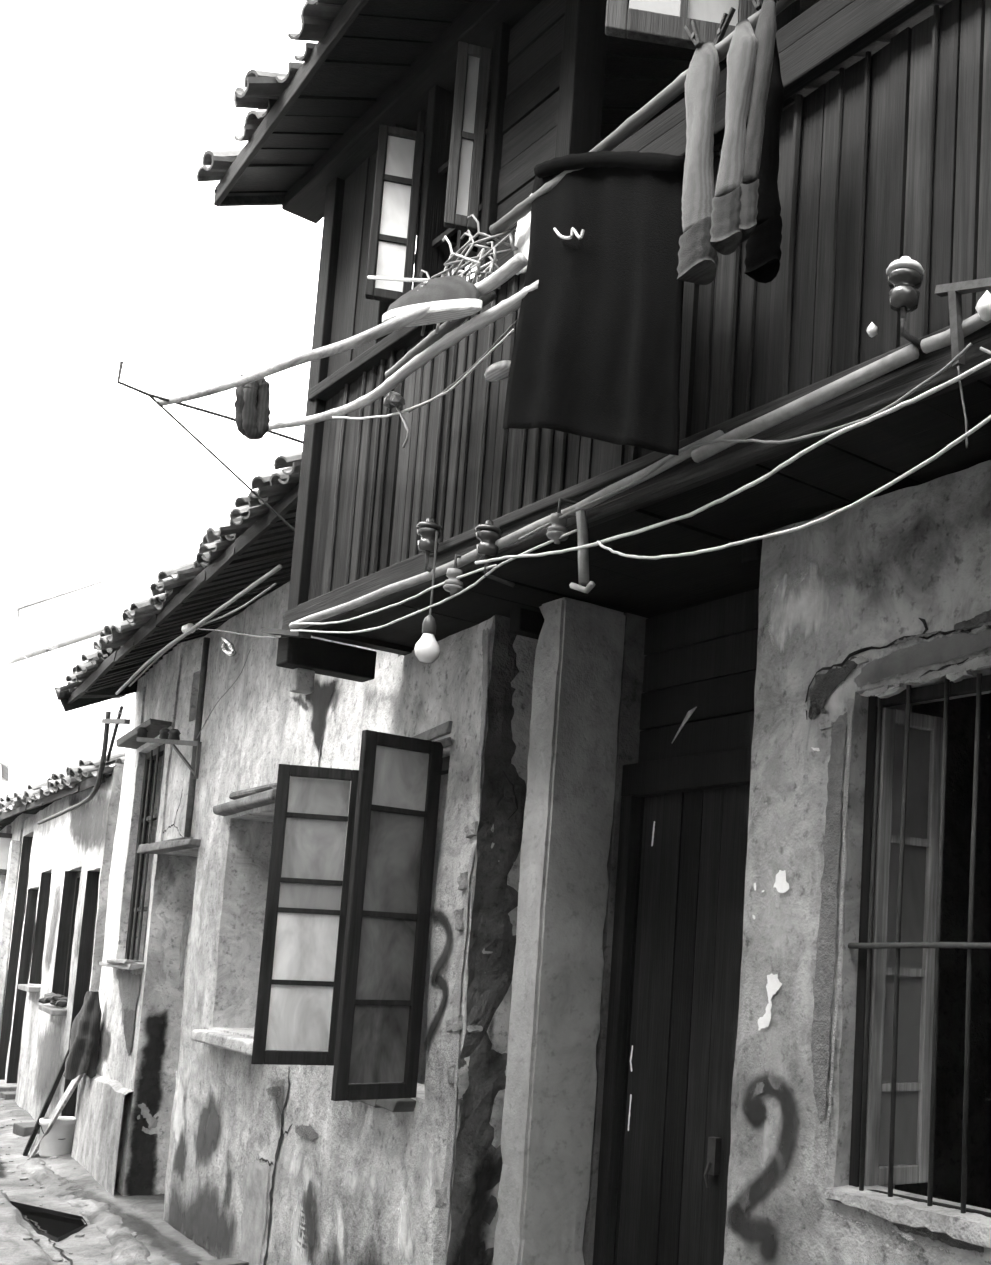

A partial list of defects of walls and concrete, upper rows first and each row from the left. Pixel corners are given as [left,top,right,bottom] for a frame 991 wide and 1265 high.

flaking render [478,628,489,806]
crack [805,618,991,719]
peeling [754,870,789,893]
flaking render [803,610,991,1186]
flaking render [433,821,483,1265]
peeling [758,973,782,1030]
water stain [290,1153,344,1265]
water stain [399,1204,412,1261]
flaking render [881,1222,991,1264]